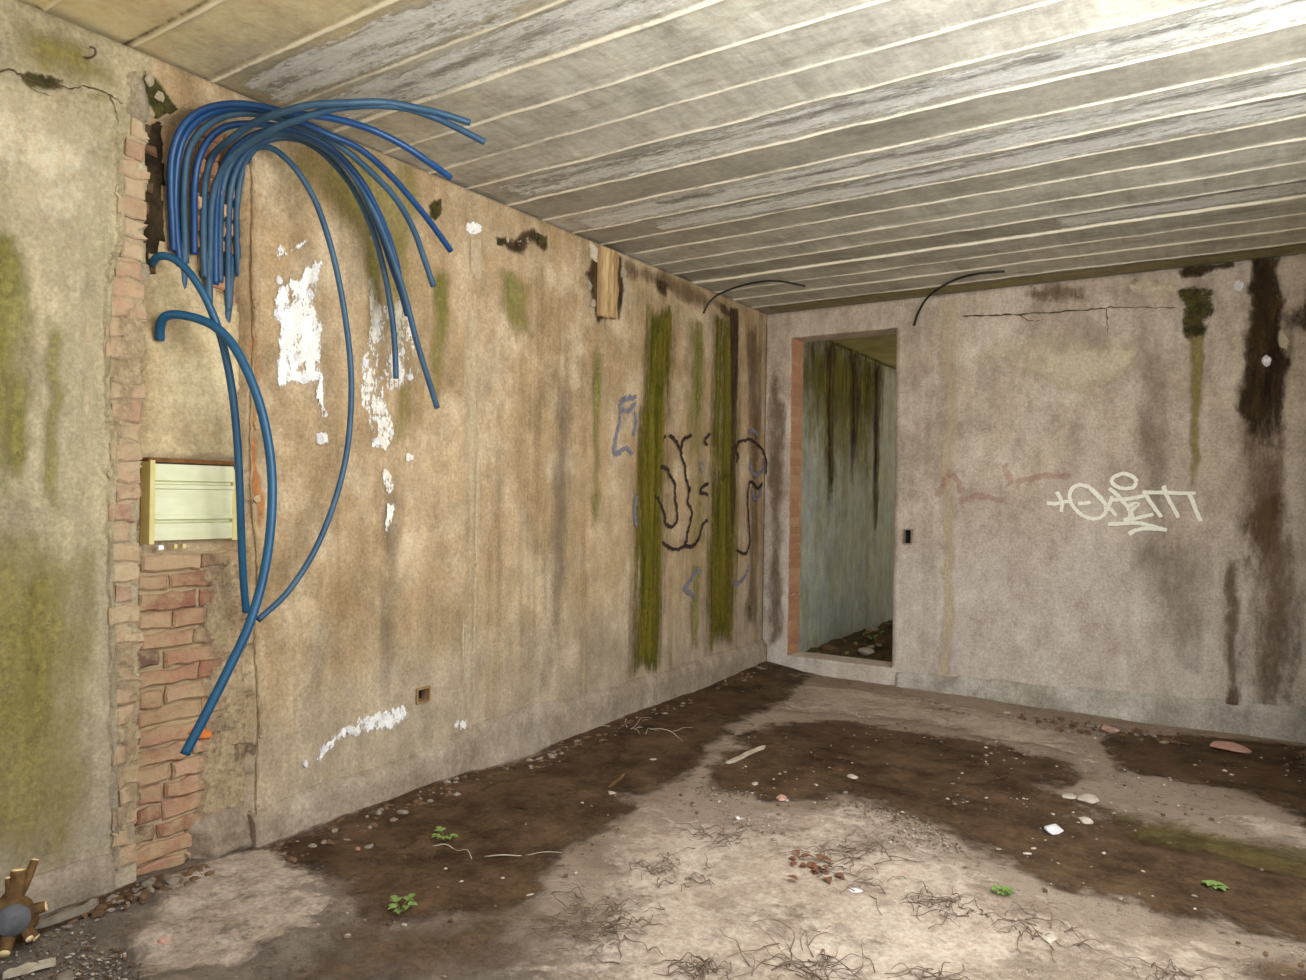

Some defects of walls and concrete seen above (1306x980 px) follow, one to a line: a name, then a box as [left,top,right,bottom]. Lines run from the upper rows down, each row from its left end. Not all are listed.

crack [0,68,123,122]
damp [0,104,94,301]
flaking render [102,74,266,876]
peeling [193,124,328,445]
peeling [359,279,418,451]
peeling [382,468,395,532]
damp [627,264,784,667]
damp [810,343,880,528]
damp [1191,336,1204,470]
damp [1238,257,1306,699]
damp [1227,570,1238,706]
peeling [302,705,408,767]